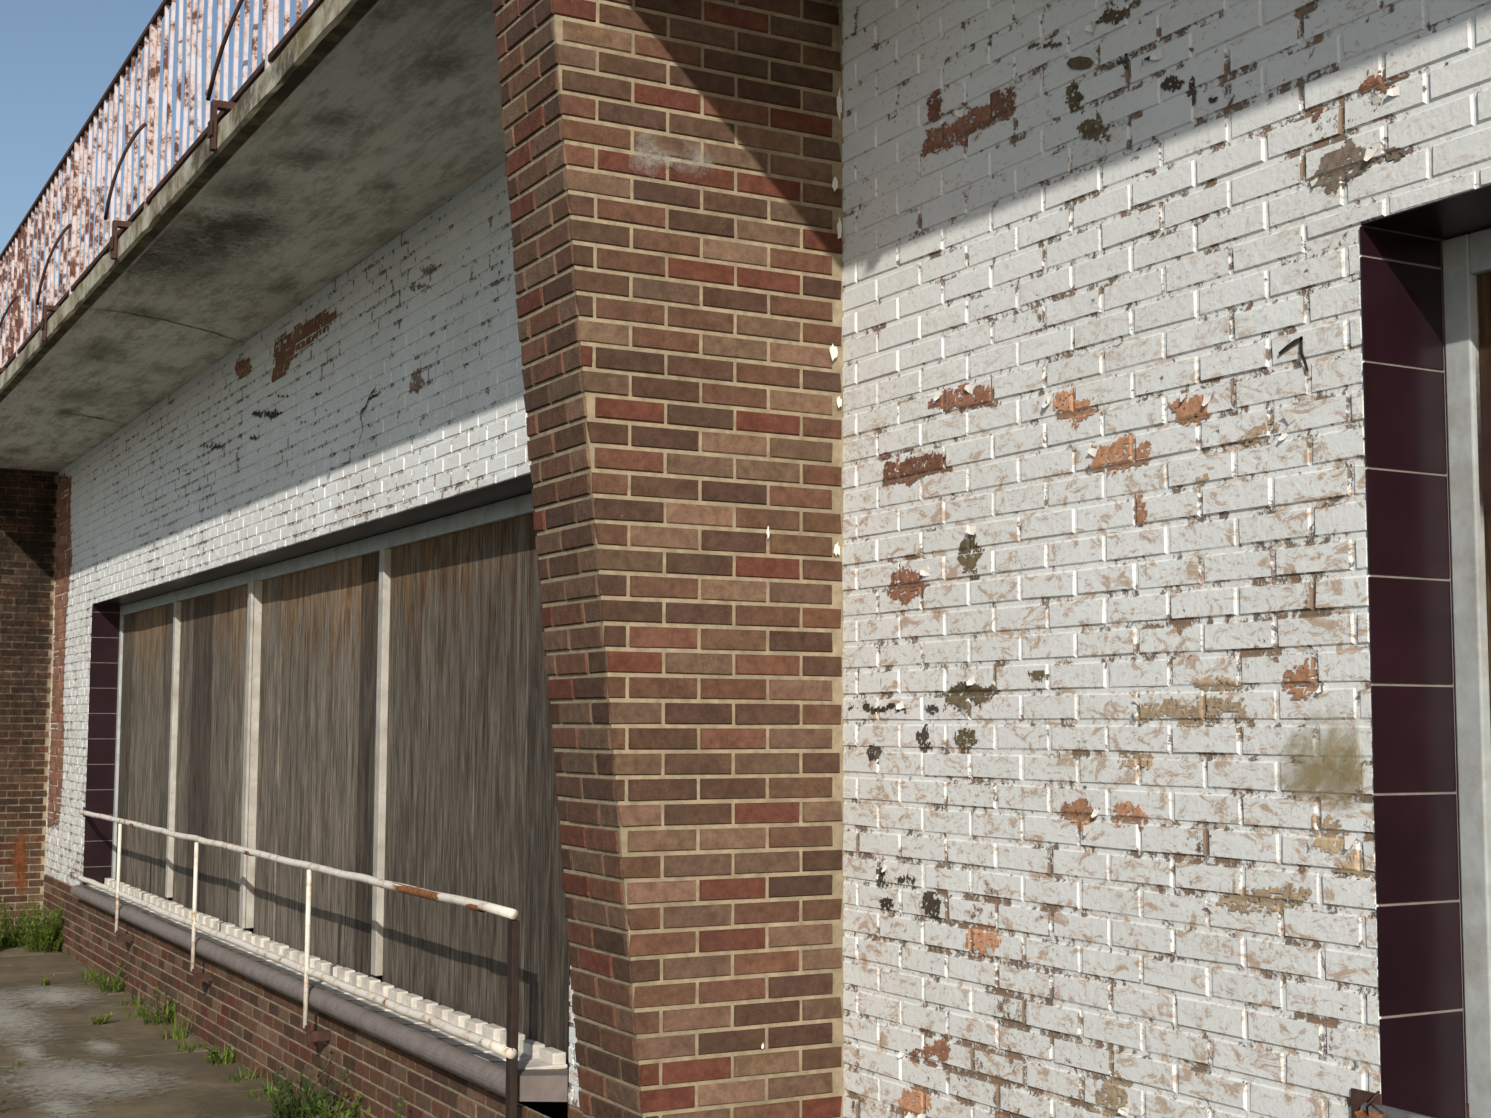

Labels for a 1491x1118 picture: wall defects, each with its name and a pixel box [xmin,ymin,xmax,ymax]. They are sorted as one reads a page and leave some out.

peeling [920,85,1016,161]
peeling [1027,33,1120,158]
peeling [1307,138,1408,194]
peeling [881,448,953,487]
peeling [1085,433,1152,476]
peeling [957,525,985,580]
peeling [916,675,1000,754]
peeling [1061,798,1148,836]
rust [393,882,444,903]
peeling [876,864,942,923]
peeling [897,1028,951,1068]
rust [1355,1110,1383,1118]